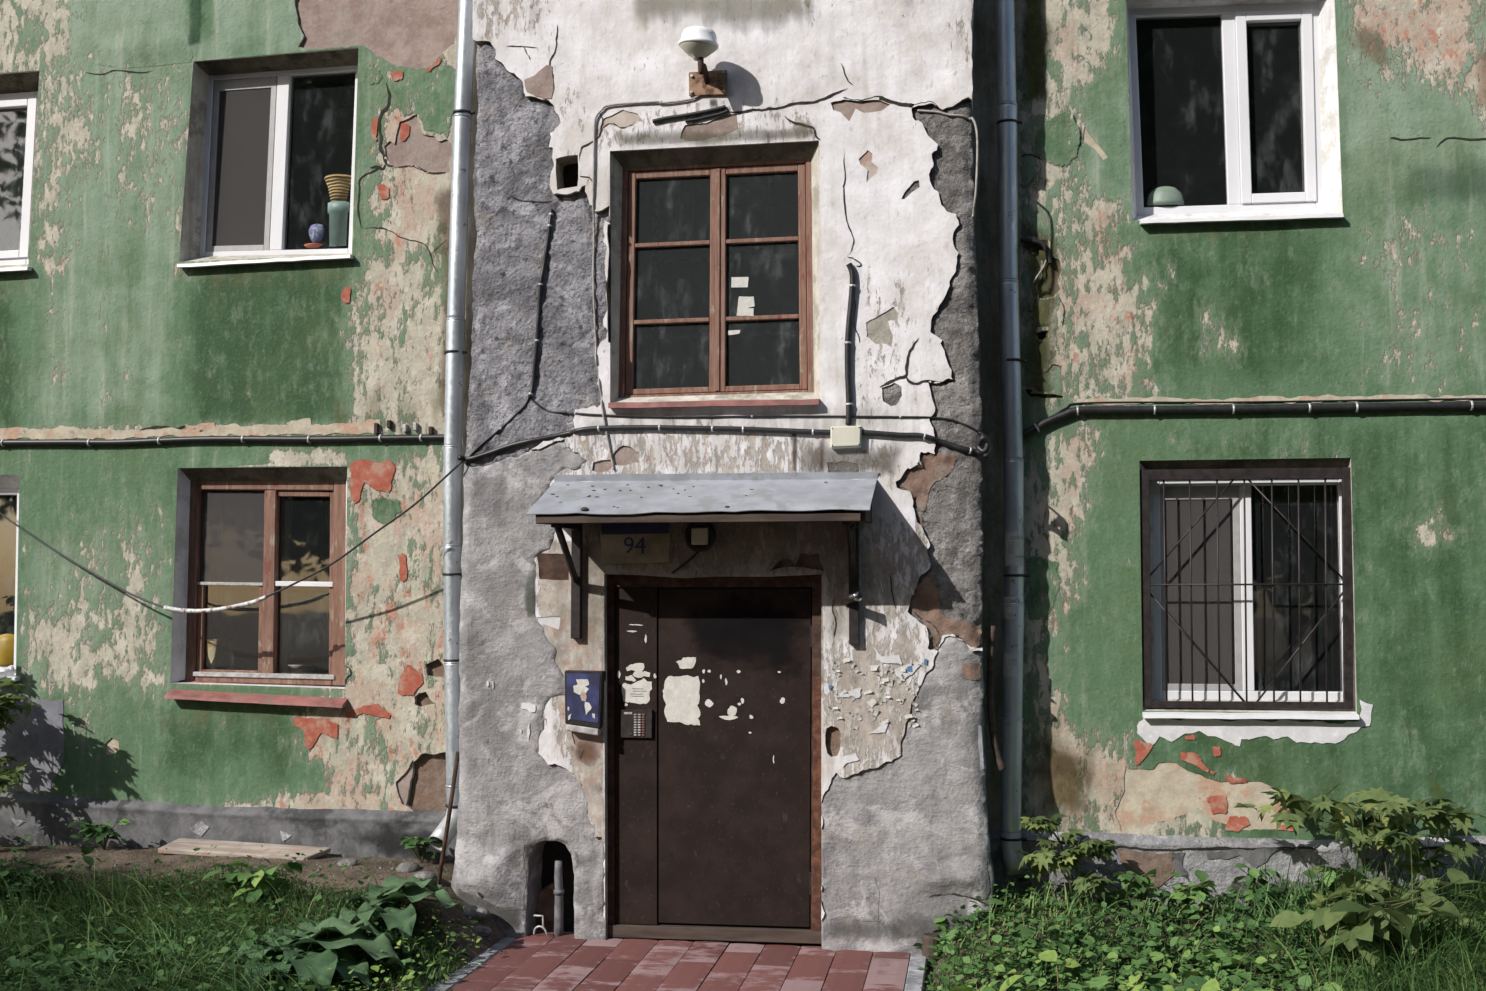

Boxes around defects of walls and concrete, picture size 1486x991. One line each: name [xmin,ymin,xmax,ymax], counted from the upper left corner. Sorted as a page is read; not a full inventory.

damp [189,0,199,43]
peeling [296,0,458,173]
peeling [524,65,554,99]
crack [1391,137,1486,147]
crack [728,64,939,343]
peeling [902,181,920,199]
flaking render [900,454,957,528]
flaking render [909,576,982,680]
peeling [398,659,444,706]
hole [826,726,841,756]
spalling [396,752,447,811]
peeling [1115,734,1294,888]